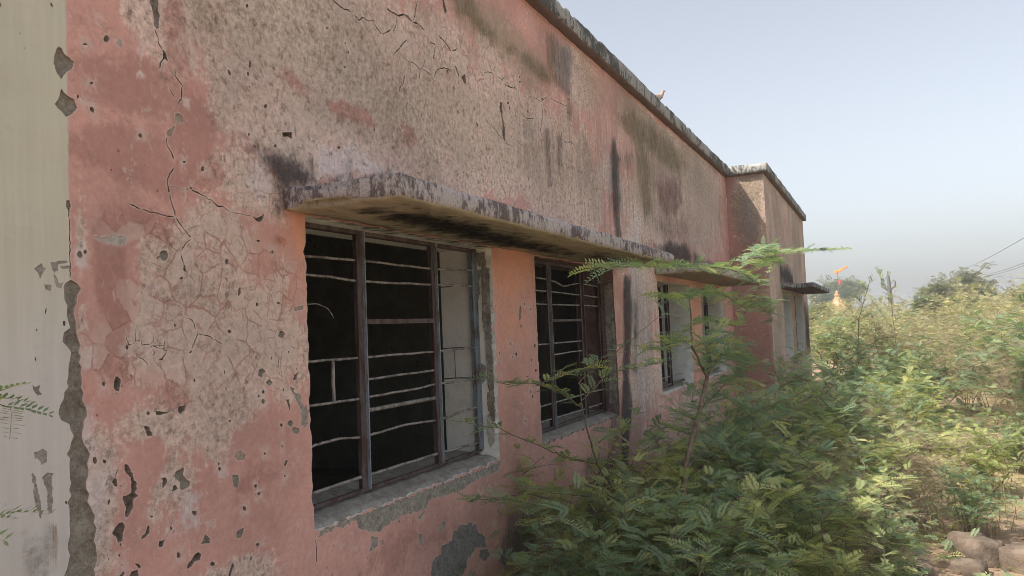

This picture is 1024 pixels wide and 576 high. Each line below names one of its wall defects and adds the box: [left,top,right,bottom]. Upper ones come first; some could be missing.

flaking render [53,47,79,117]
crack [130,30,250,283]
crack [333,0,456,99]
crack [485,72,575,146]
damp [611,139,626,238]
flaking render [31,250,141,576]
crack [126,317,222,365]
damp [339,208,638,572]
peeling [476,252,517,448]
flaking render [161,468,190,492]
peeling [318,461,502,552]
peeling [431,521,512,576]